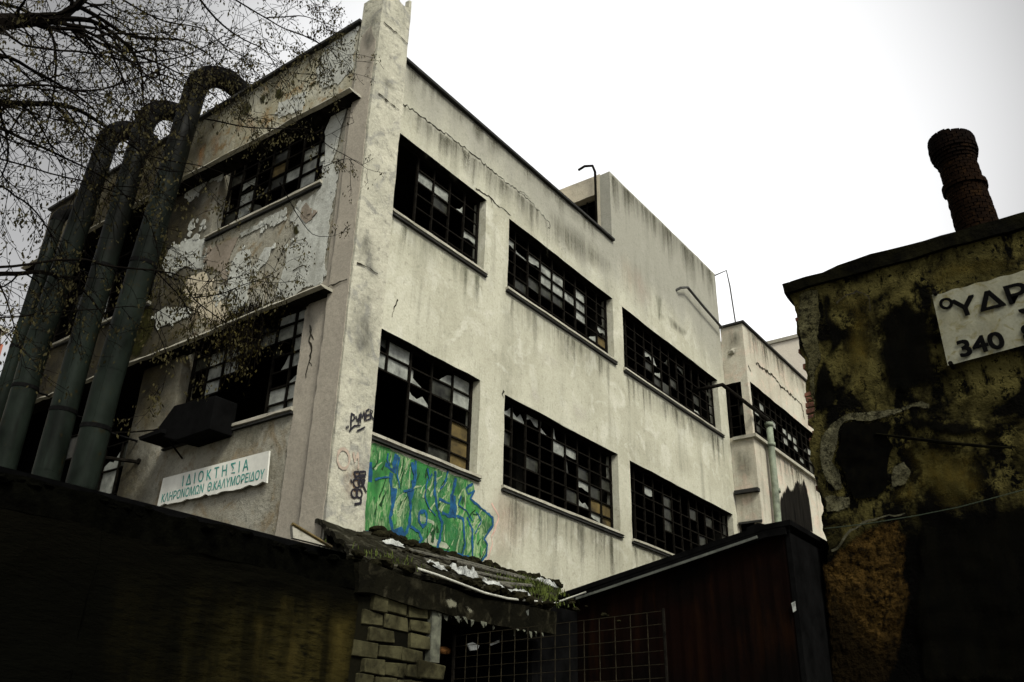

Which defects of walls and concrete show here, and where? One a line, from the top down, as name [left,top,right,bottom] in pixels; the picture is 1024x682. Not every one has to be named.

crack [379,93,550,228]
peeling [151,109,347,330]
crack [305,325,314,376]
crack [748,362,805,420]
leakage [815,294,866,411]
peeling [820,401,930,512]
leakage [879,302,934,391]
leakage [902,415,1000,439]
leakage [917,507,1024,682]